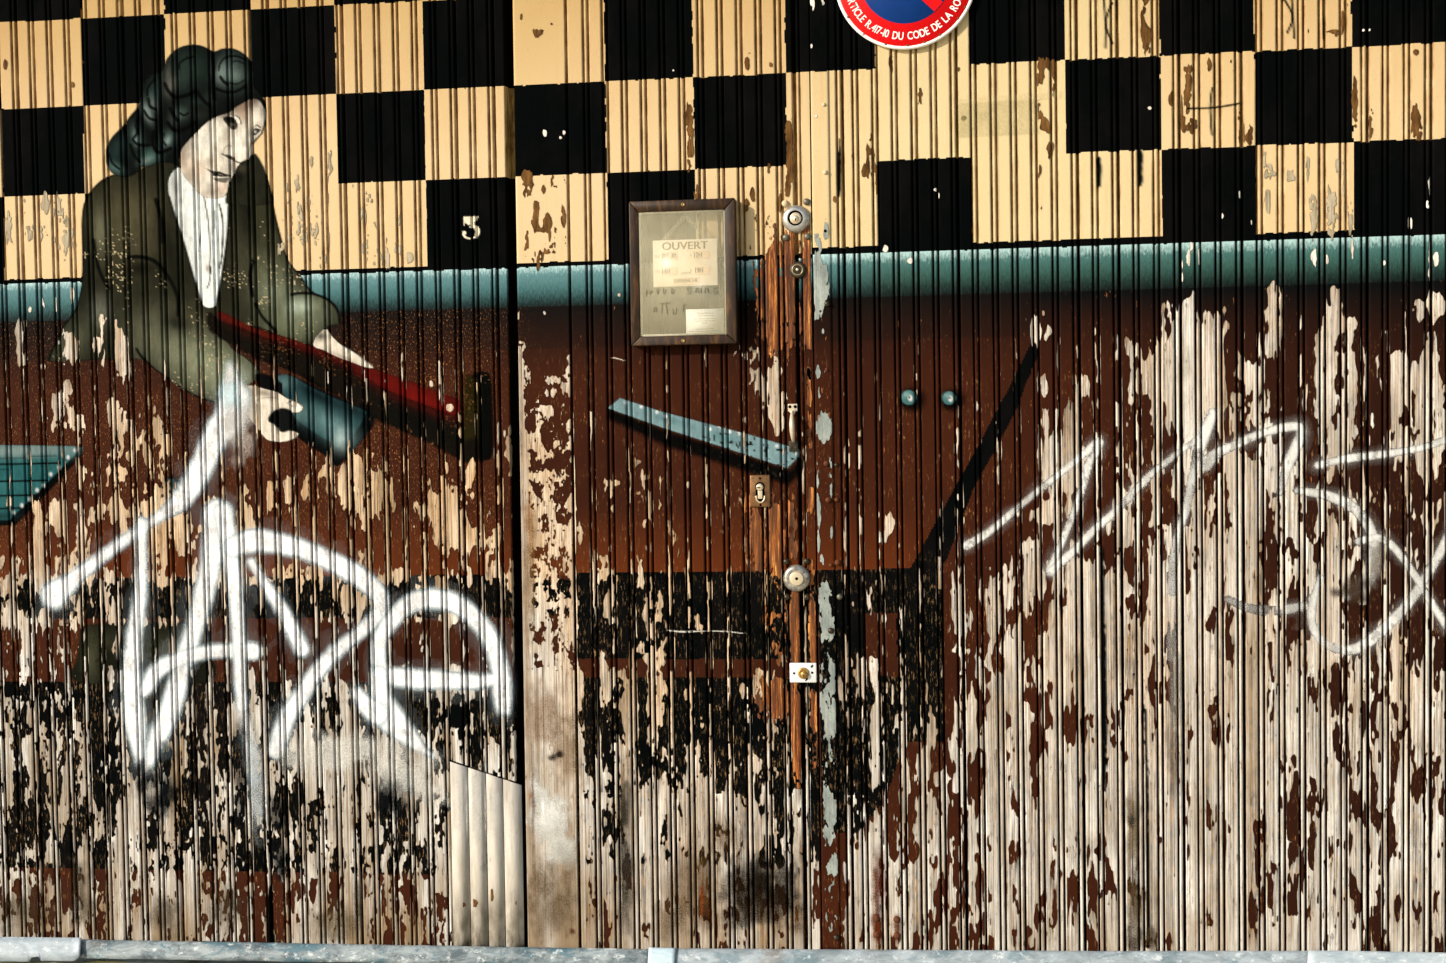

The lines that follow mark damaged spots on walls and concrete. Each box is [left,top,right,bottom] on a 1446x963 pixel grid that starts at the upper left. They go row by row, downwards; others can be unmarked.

spalling [5,191,75,261]
spalling [277,150,333,268]
spalling [352,184,416,270]
spalling [521,169,566,271]
spalling [861,133,878,195]
spalling [1037,57,1055,178]
spalling [1168,58,1212,134]
spalling [1238,111,1354,267]
spalling [1351,76,1373,141]
spalling [1408,103,1423,141]
peeling [0,241,1445,952]